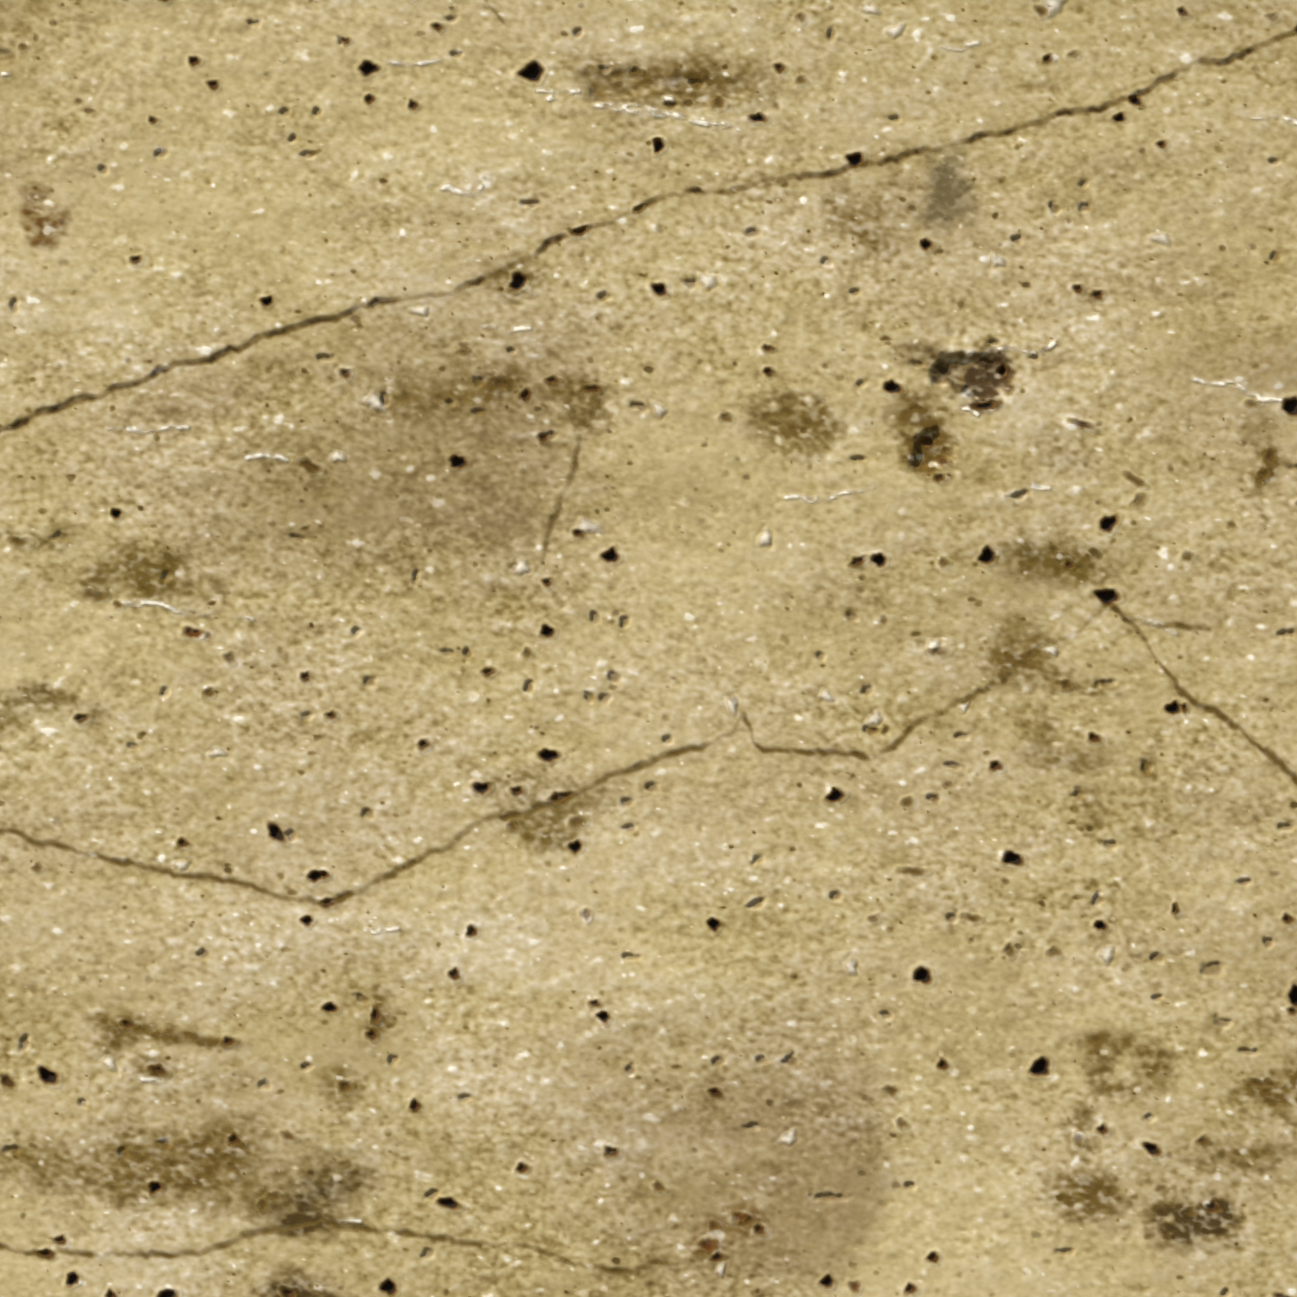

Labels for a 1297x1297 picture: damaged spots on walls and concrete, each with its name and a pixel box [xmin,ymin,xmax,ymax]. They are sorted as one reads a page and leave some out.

water stain [583,59,754,106]
crack [962,28,1297,143]
crack [0,298,400,432]
water stain [907,346,1014,411]
water stain [895,393,951,476]
crack [743,653,1033,759]
crack [1162,666,1297,785]
crack [0,743,709,906]
water stain [9,1125,366,1237]
crack [0,1221,485,1259]
water stain [1055,1176,1122,1216]
water stain [1149,1197,1241,1247]